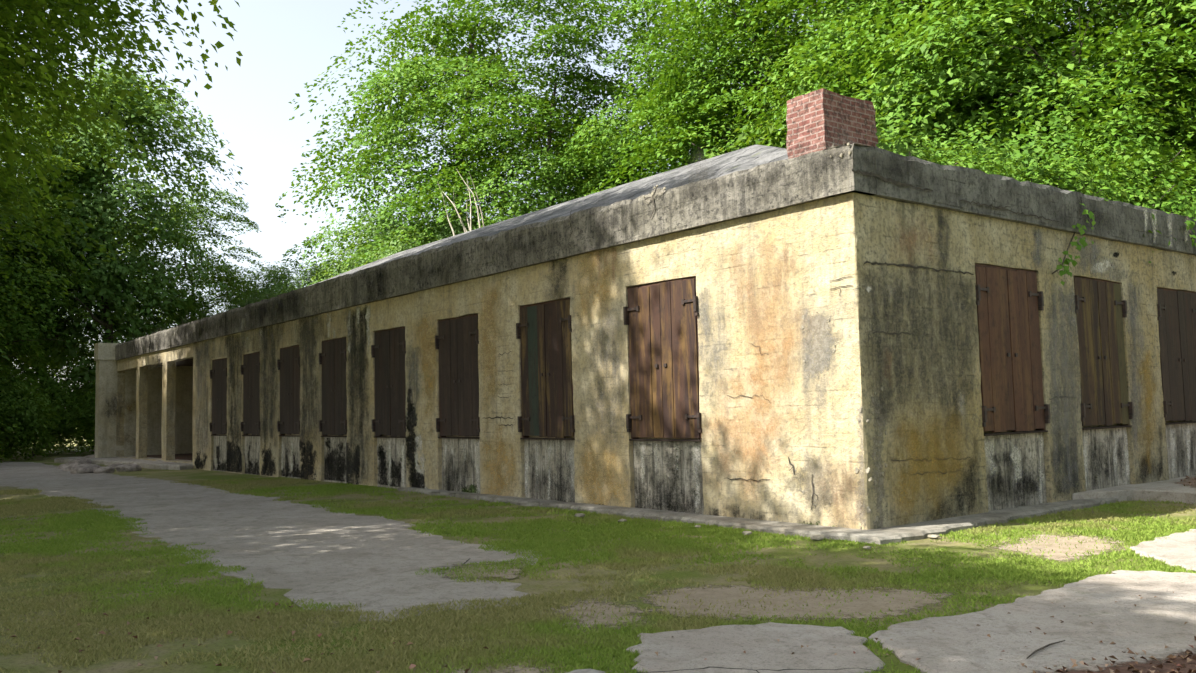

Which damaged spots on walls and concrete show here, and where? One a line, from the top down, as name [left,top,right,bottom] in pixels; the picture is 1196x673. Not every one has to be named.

water stain [128,271,435,488]
water stain [867,212,976,410]
crack [724,457,818,510]